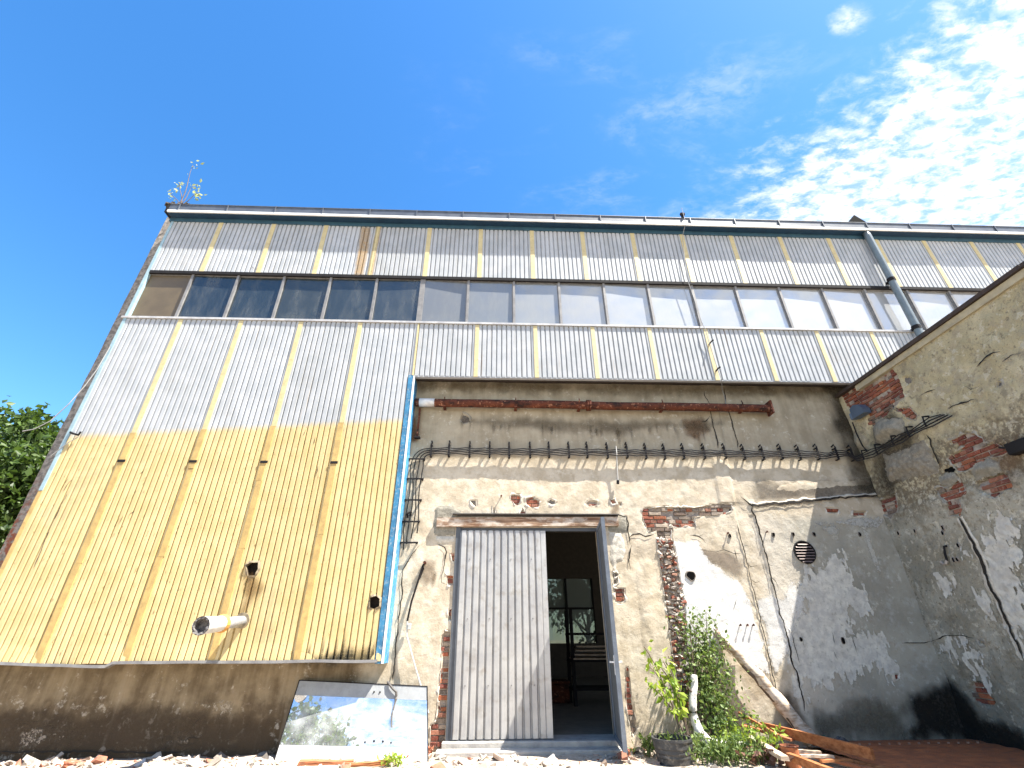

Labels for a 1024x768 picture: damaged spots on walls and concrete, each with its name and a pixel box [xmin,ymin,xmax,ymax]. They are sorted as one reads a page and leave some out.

spalling [842,369,918,426]
spalling [428,607,452,754]
spalling [509,492,557,513]
spalling [640,503,734,542]
crack [692,492,878,711]
peeling [781,548,900,704]
leakage [785,682,1024,750]
peeling [934,634,996,706]
spalling [933,430,1007,536]
peeling [933,474,1024,661]
crack [956,516,1024,658]